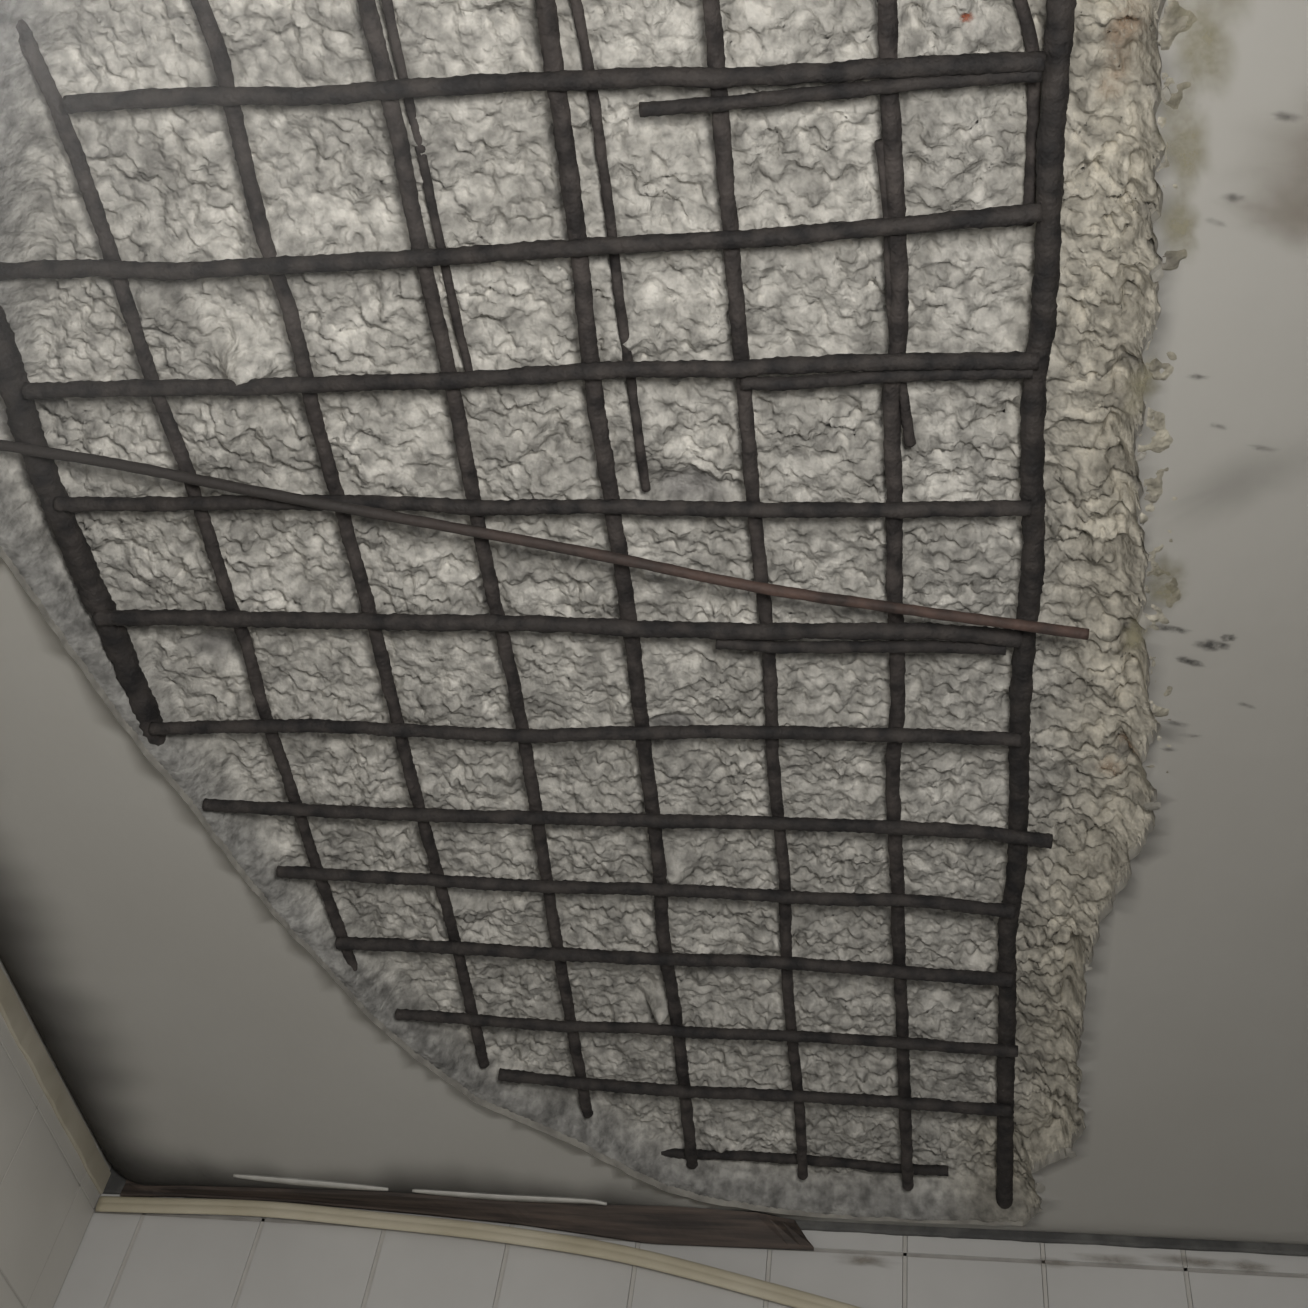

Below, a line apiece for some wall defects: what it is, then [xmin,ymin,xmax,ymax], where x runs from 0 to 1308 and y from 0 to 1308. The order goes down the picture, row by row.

spalling [0,0,411,263]
spalling [399,90,568,249]
spalling [567,79,883,237]
spalling [899,82,1042,216]
spalling [588,249,734,362]
spalling [740,236,890,359]
spalling [906,222,1036,353]
spalling [0,257,621,619]
spalling [602,371,887,503]
spalling [901,378,1024,630]
spalling [1013,0,1198,1222]
spalling [0,451,1014,1223]